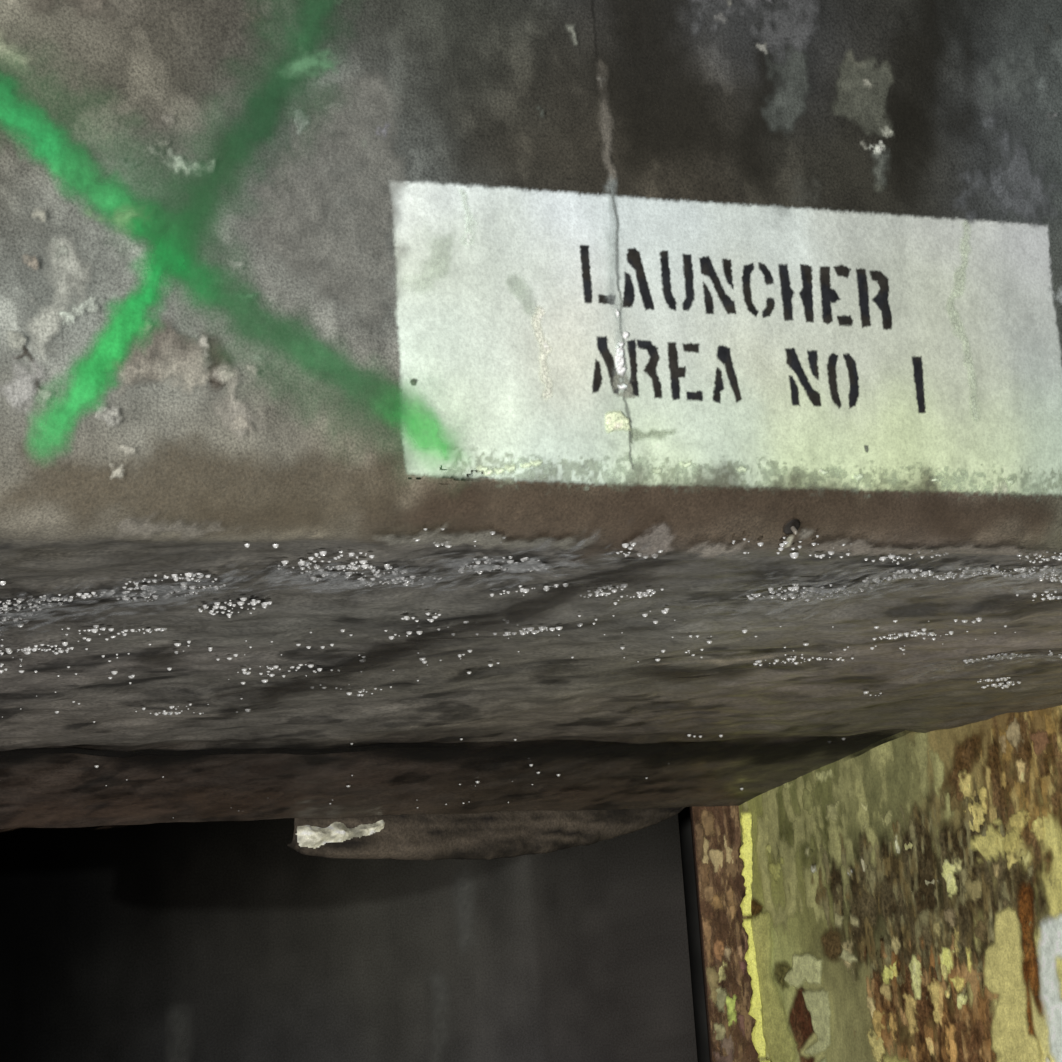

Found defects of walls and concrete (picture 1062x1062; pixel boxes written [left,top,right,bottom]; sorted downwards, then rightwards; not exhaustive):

peeling [691,0,818,130]
peeling [834,53,893,191]
crack [597,61,634,469]
damp [0,570,251,632]
damp [42,449,400,539]
damp [264,529,592,593]
damp [630,524,673,559]
damp [733,539,1062,619]
damp [0,736,897,768]
peeling [907,732,954,913]
peeling [695,741,913,1062]
peeling [984,907,1041,1062]